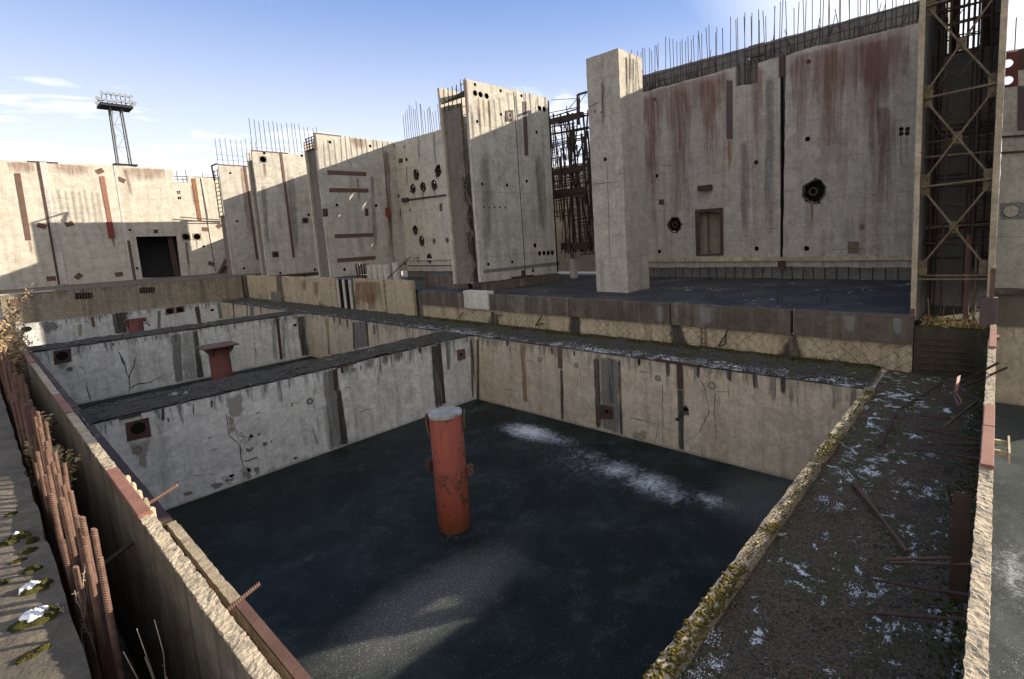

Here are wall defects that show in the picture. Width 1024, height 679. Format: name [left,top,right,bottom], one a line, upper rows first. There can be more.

crack [119,352,164,392]
crack [177,416,244,482]